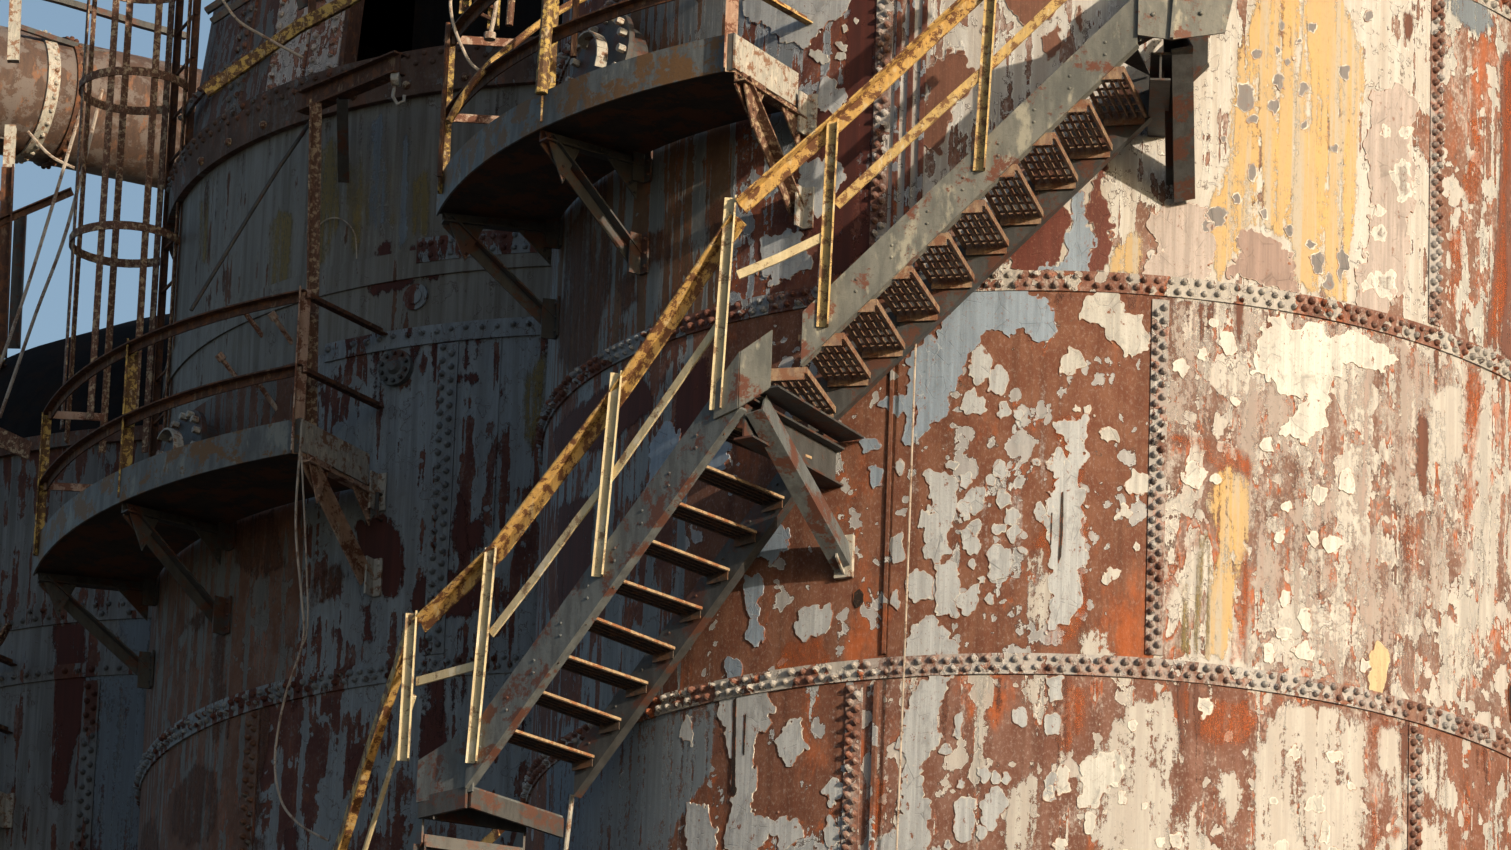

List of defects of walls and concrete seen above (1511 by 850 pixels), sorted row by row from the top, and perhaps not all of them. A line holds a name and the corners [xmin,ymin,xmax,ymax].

rust [553,385,609,457]
rust [587,374,653,452]
rust [674,357,711,440]
peeling [859,291,1087,489]
peeling [1079,292,1151,358]
rust [354,513,426,644]
rust [557,495,595,607]
peeling [889,404,1121,656]
peeling [1167,297,1511,693]
rust [418,675,467,759]
peeling [544,692,810,850]
peeling [859,675,1448,850]